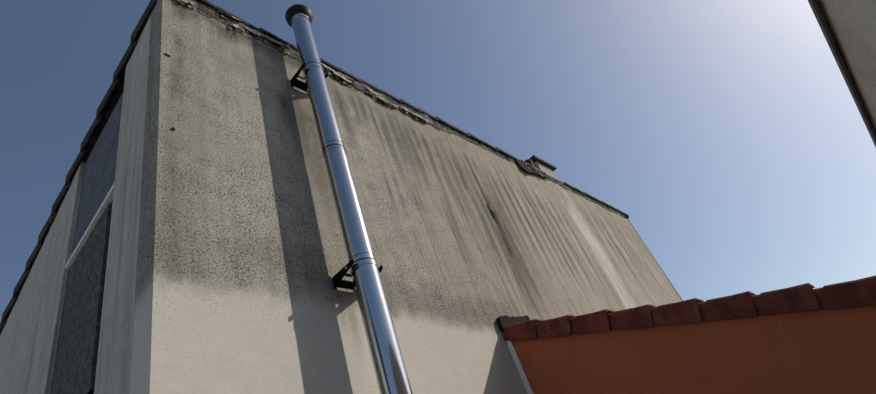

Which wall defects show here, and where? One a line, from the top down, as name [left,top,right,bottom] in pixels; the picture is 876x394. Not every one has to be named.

damp [564,192,635,309]